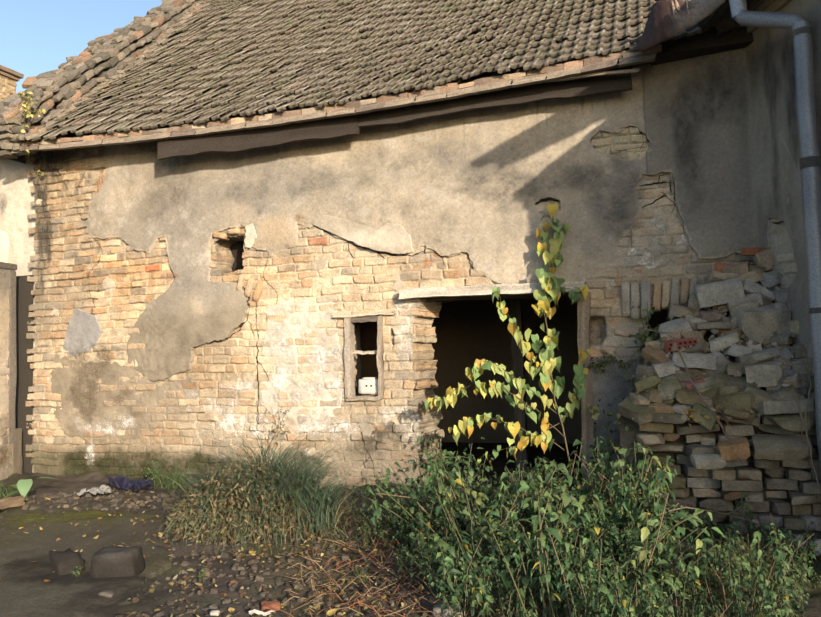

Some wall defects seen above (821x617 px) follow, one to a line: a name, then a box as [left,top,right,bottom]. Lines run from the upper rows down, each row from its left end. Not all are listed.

spalling [590,126,650,161]
crack [210,286,269,436]
spalling [25,146,500,490]
spalling [586,173,755,391]
peeling [735,330,801,360]
spalling [755,218,798,304]